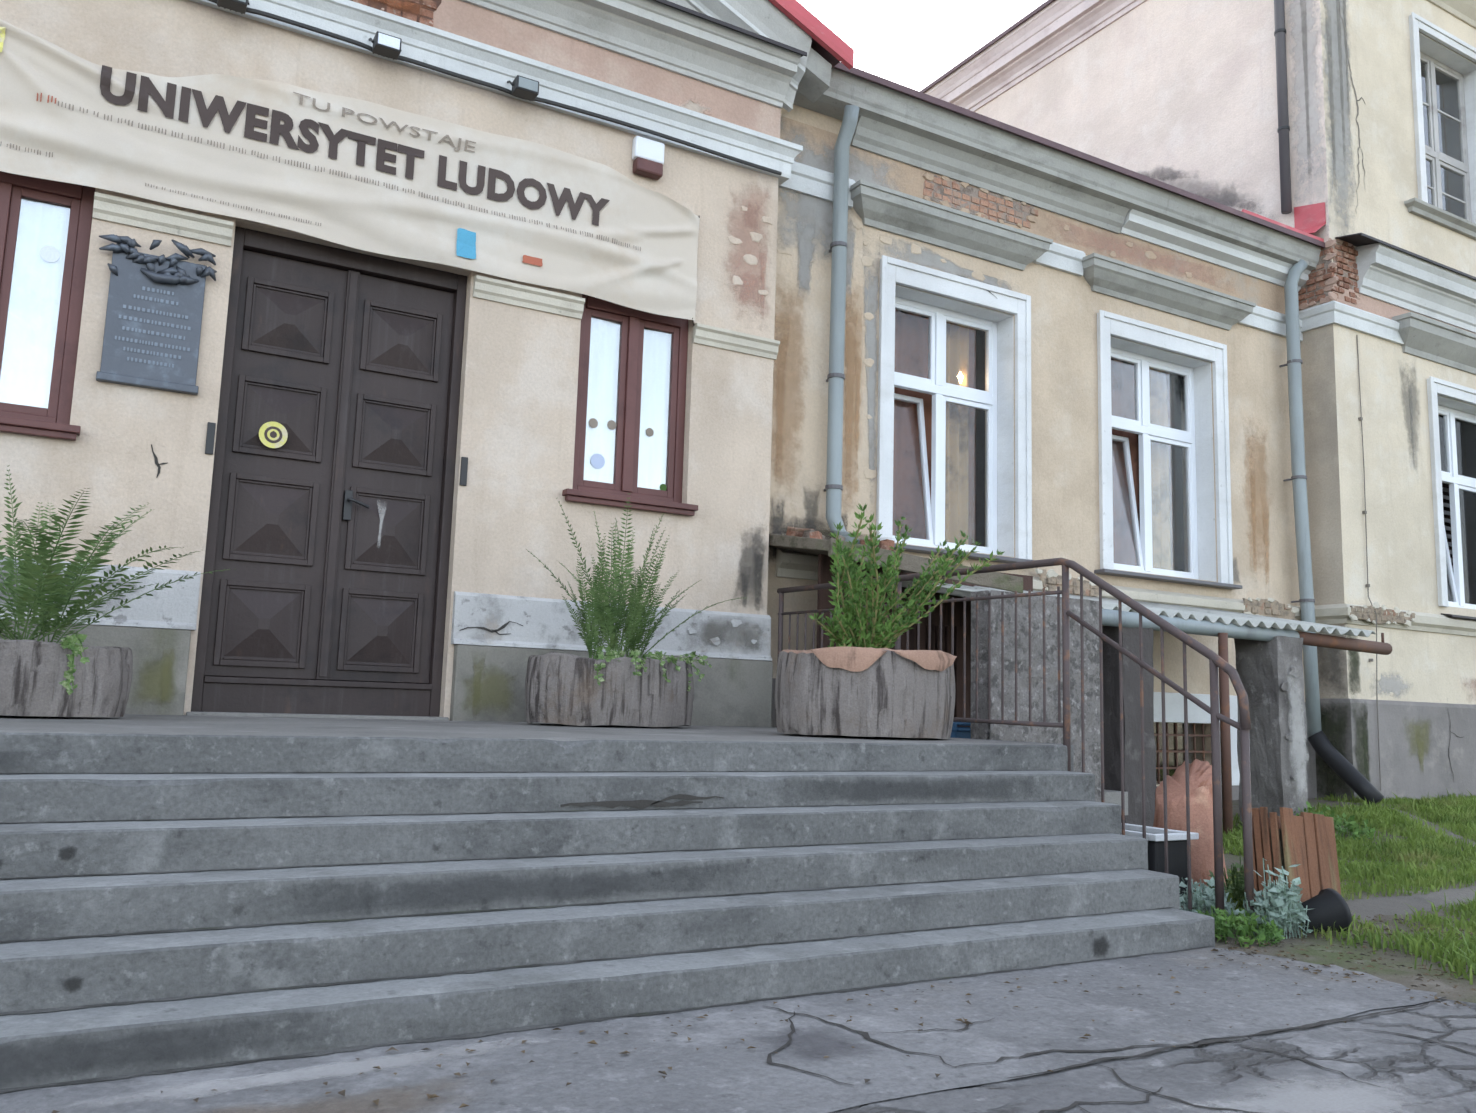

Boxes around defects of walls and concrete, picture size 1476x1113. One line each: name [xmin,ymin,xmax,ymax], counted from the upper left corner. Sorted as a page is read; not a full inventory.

spalling [350,0,442,27]
water stain [1302,26,1310,146]
water stain [1328,0,1348,154]
crack [1339,2,1366,214]
spalling [922,172,1038,228]
spalling [1298,236,1361,310]
water stain [738,496,847,604]
spalling [1243,597,1300,620]
spalling [1349,602,1416,627]
crack [1009,997,1476,1113]